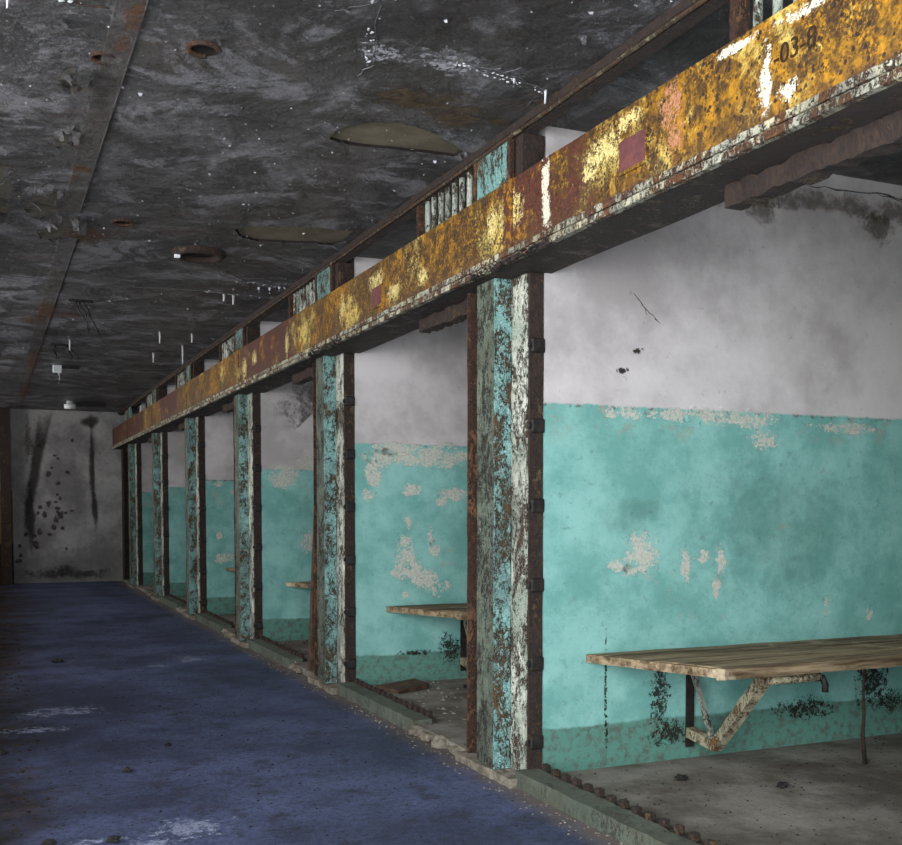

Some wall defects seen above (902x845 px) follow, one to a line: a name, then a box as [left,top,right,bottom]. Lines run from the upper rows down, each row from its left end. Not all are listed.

crack [59,0,109,9]
crack [336,0,382,76]
crack [452,61,549,93]
rust [658,76,685,158]
rust [171,245,226,264]
rust [470,235,551,281]
peeling [598,405,778,451]
water stain [25,426,48,542]
water stain [81,417,98,524]
peeling [362,442,467,502]
peeling [679,543,727,601]
water stain [646,671,685,747]